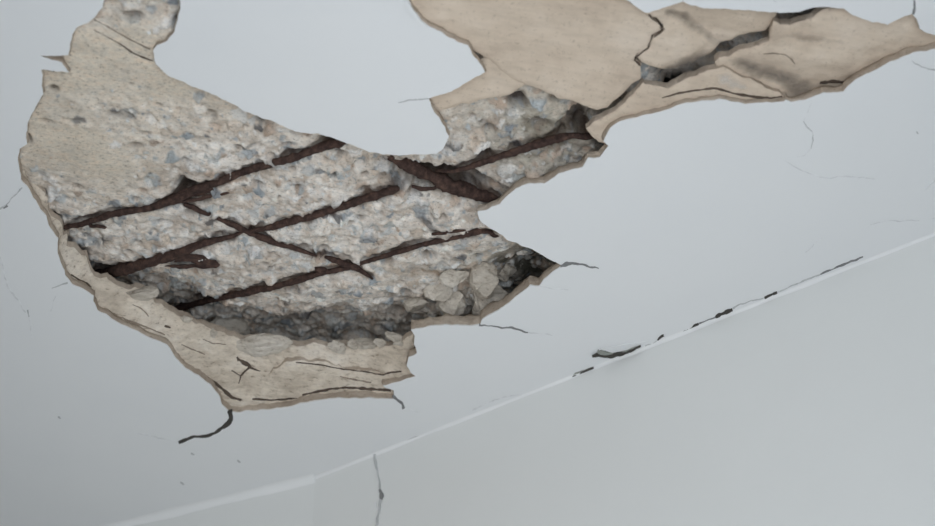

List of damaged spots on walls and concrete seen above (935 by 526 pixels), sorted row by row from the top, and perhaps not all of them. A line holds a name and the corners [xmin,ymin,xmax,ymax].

corrosion [63,138,499,311]
spalling [18,0,935,413]
corrosion [387,132,594,203]
crack [645,256,863,346]
crack [113,305,419,444]
crack [373,454,384,526]